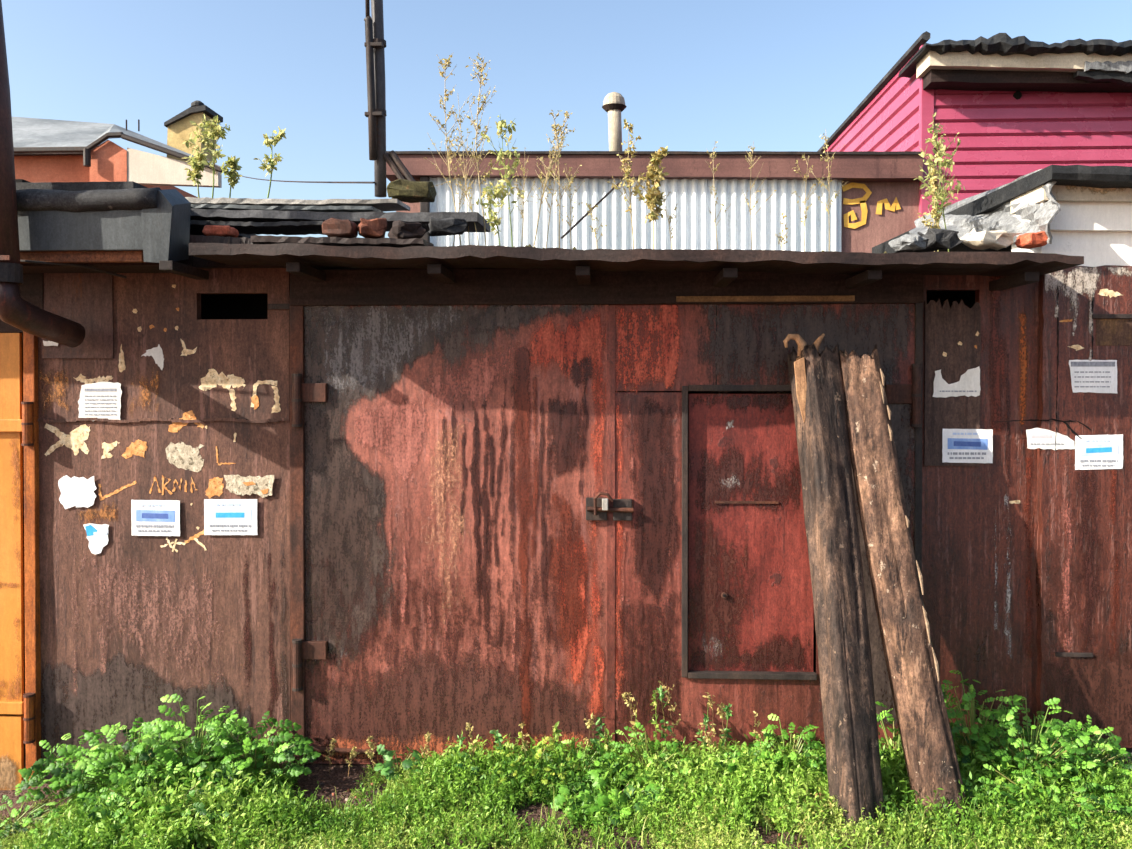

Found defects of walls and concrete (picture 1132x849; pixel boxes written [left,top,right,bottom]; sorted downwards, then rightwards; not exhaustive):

corrosion [40,372,68,410]
corrosion [133,374,159,407]
corrosion [982,276,1028,486]
corrosion [84,504,116,524]
corrosion [71,557,223,693]
corrosion [242,553,252,701]
corrosion [267,553,288,752]
corrosion [305,305,680,763]
corrosion [1059,469,1120,659]